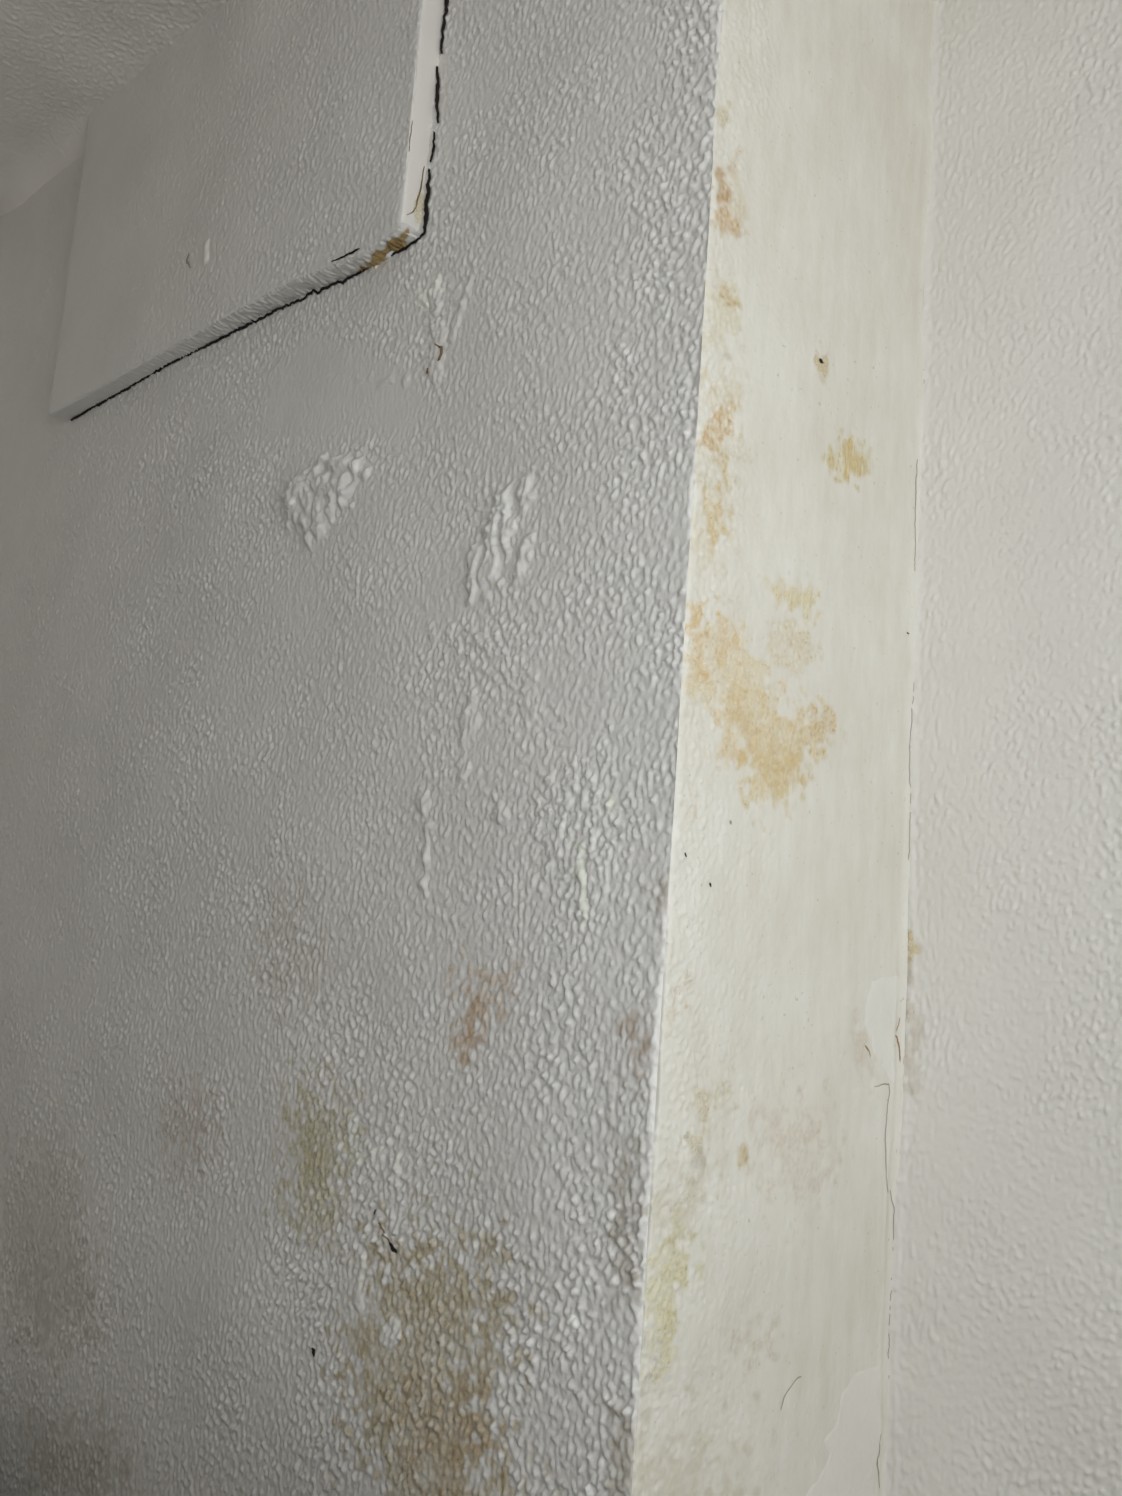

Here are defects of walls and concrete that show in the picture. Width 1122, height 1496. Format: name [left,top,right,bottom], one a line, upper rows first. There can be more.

crack [70,0,449,421]